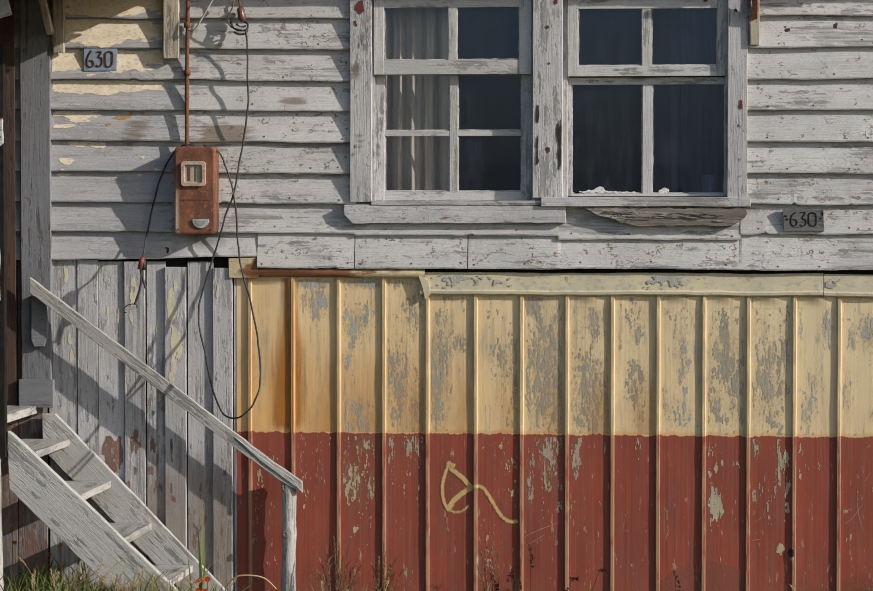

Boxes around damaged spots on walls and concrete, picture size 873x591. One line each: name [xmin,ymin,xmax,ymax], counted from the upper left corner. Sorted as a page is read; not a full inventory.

rust [257,270,301,433]
peeling [298,279,329,332]
peeling [343,275,512,537]
peeling [487,297,608,519]
peeling [621,297,644,346]
peeling [624,359,652,426]
peeling [644,276,684,289]
peeling [662,302,698,428]
peeling [708,305,818,531]
peeling [847,313,873,351]